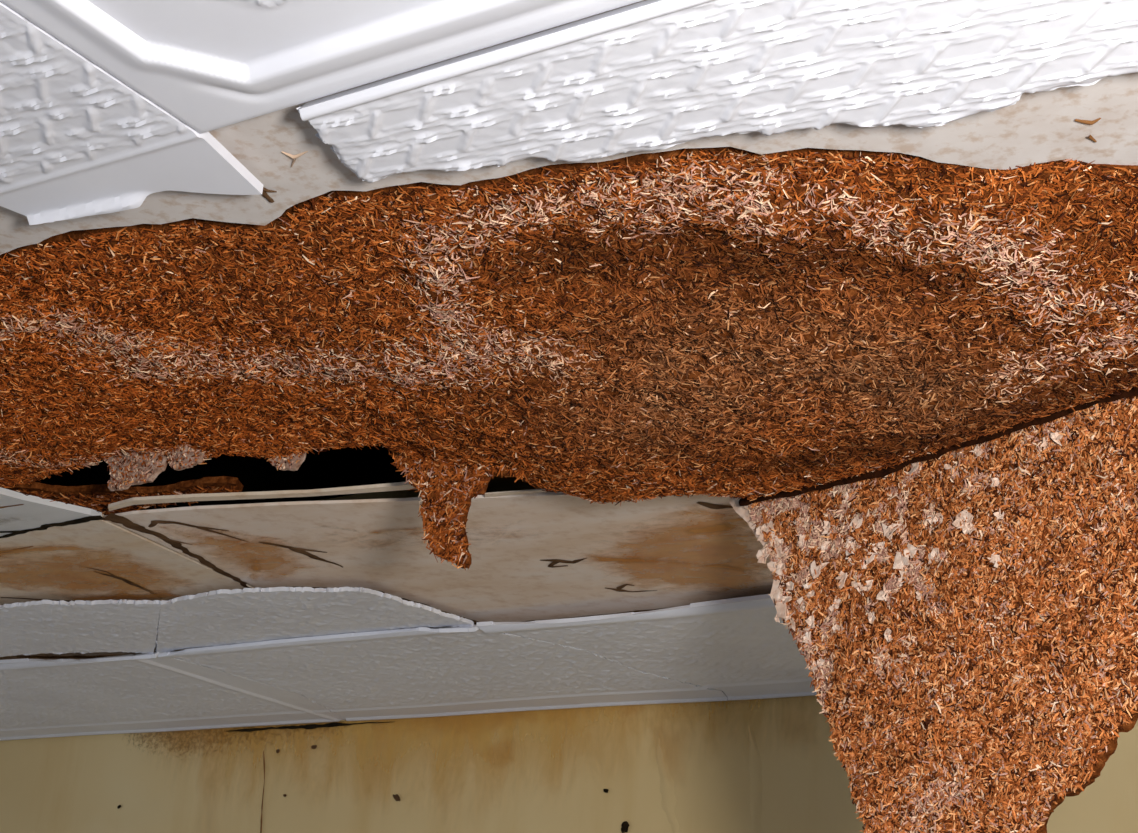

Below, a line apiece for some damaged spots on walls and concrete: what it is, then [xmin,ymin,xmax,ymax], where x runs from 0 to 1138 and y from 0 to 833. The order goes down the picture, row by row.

peeling [0,147,1138,570]
leakage [0,546,176,601]
crack [78,565,171,601]
crack [0,504,343,590]
crack [376,590,478,624]
crack [522,607,672,622]
spalling [606,584,657,592]
leakage [598,511,758,591]
peeling [756,517,831,644]
peeling [829,516,940,634]
crack [21,652,109,660]
leakage [220,706,615,767]